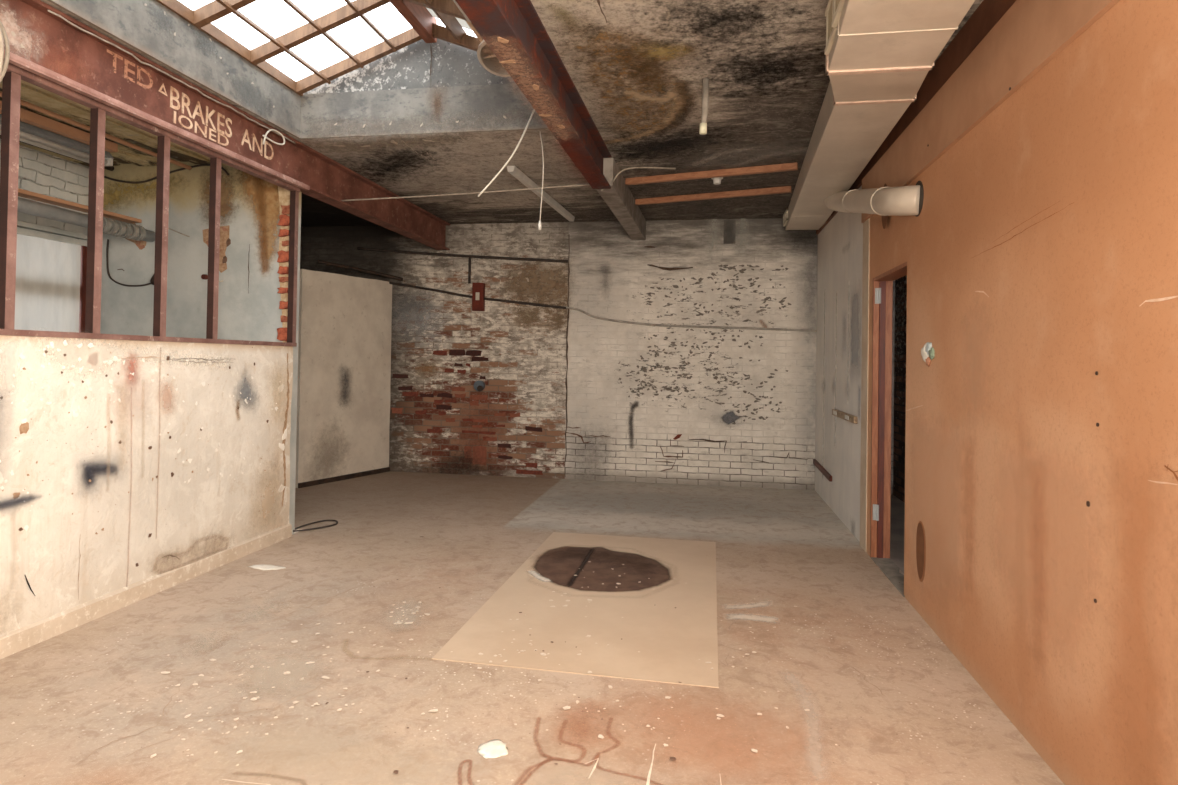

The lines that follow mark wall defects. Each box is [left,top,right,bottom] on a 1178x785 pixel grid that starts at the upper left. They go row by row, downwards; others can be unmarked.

damp [566,1,830,163]
peeling [641,264,791,316]
spalling [391,350,543,475]
peeling [618,329,788,425]